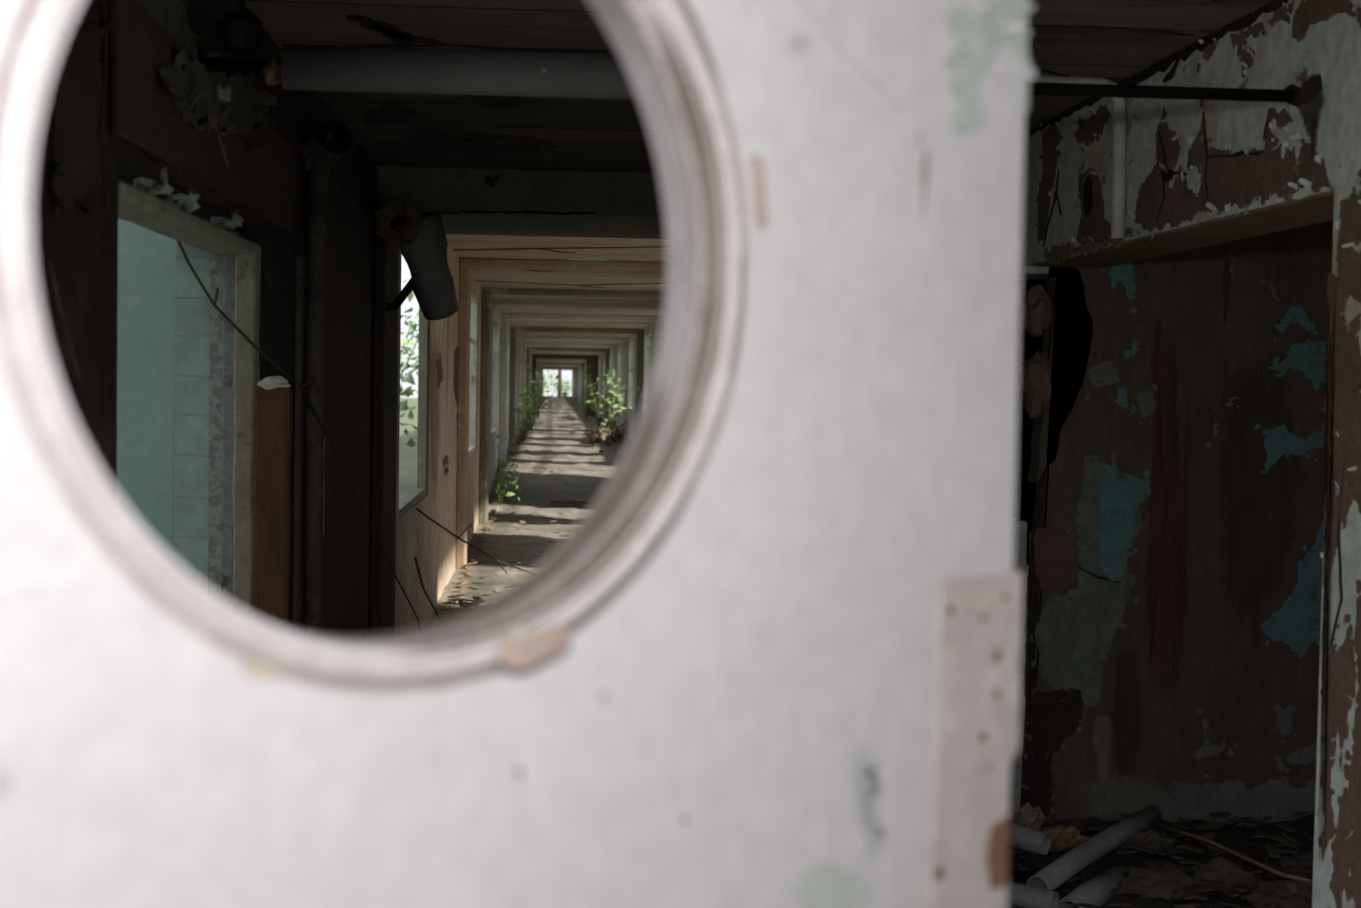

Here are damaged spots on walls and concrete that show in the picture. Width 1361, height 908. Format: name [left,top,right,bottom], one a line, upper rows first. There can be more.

peeling [157,42,277,153]
peeling [942,0,1036,134]
peeling [1197,0,1361,78]
peeling [1018,74,1361,908]